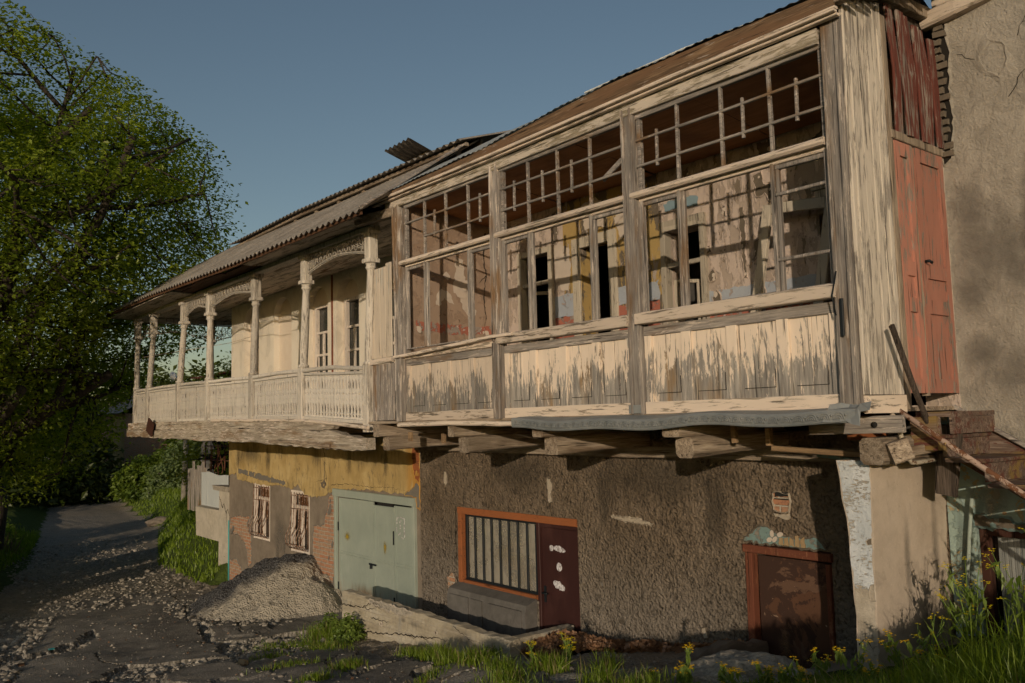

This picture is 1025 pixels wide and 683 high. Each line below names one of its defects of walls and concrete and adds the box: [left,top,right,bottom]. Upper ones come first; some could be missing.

peeling [755,138,770,156]
peeling [551,211,571,291]
peeling [581,197,624,239]
peeling [708,268,722,301]
peeling [721,204,759,278]
peeling [751,171,771,201]
spalling [312,479,334,587]
peeling [837,460,878,670]